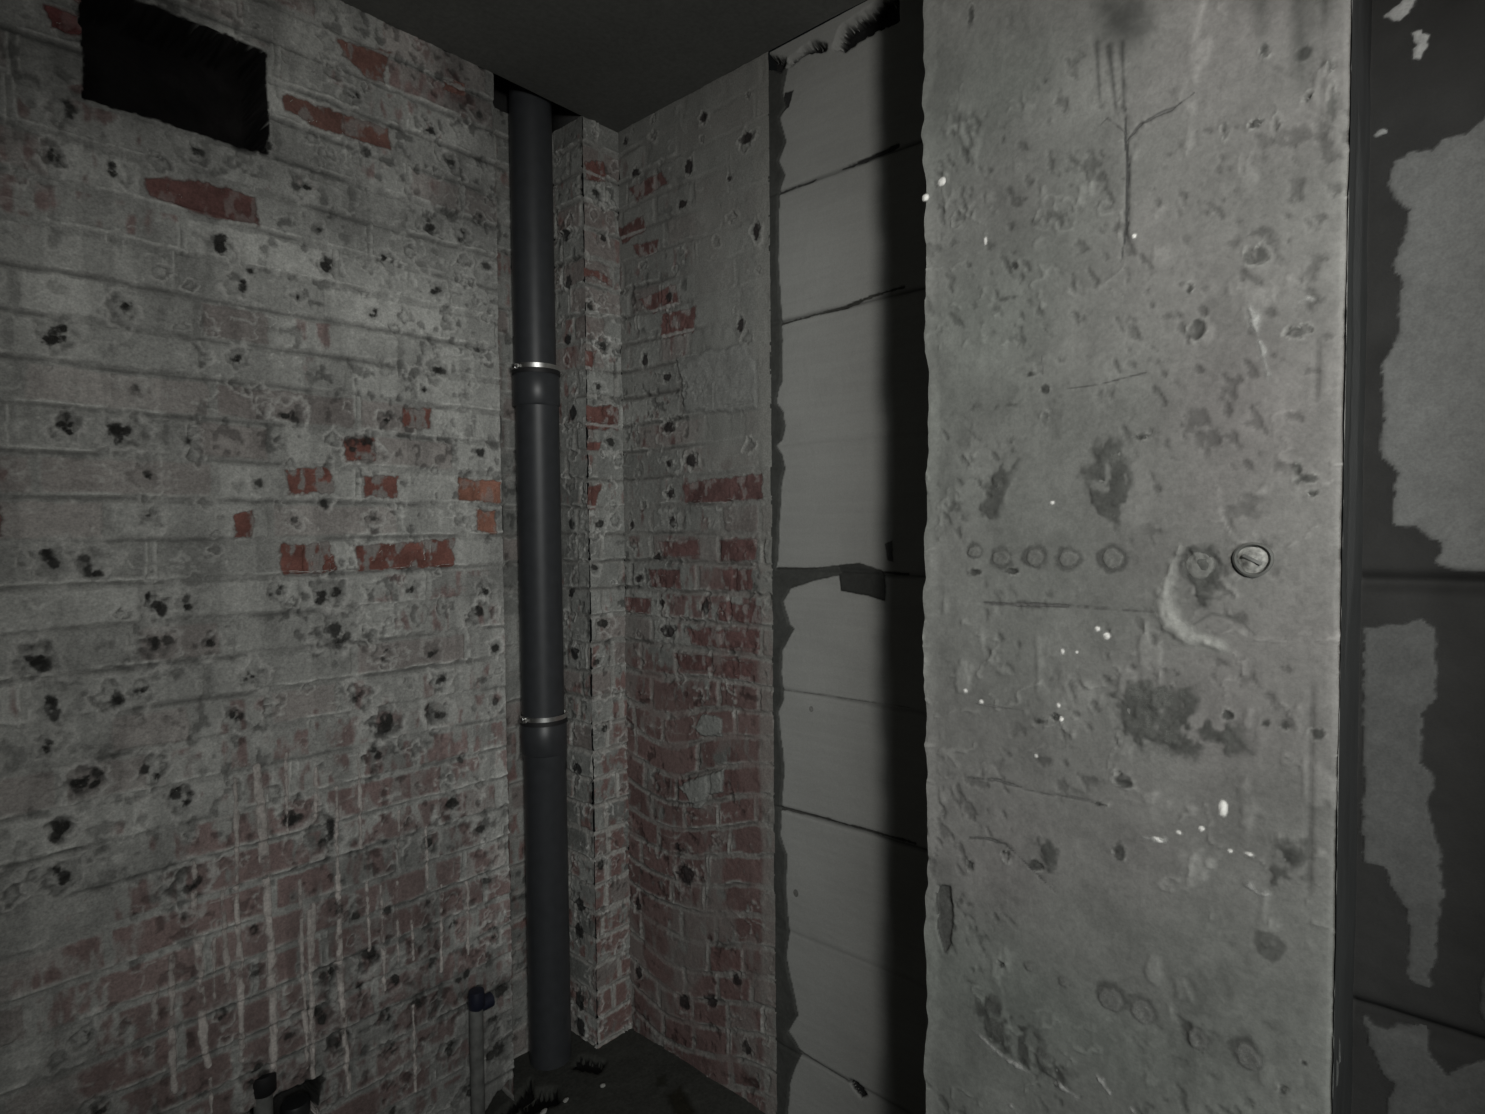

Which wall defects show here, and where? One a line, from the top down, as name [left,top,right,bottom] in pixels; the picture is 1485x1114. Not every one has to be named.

peeling [1384,0,1429,59]
crack [1107,102,1182,254]
peeling [1379,117,1485,572]
peeling [1360,619,1445,988]
damp [151,955,178,1094]
damp [191,763,278,1114]
damp [298,880,316,1080]
damp [314,767,351,1092]
damp [365,881,415,991]
damp [424,826,443,973]
peeling [1363,1015,1485,1114]